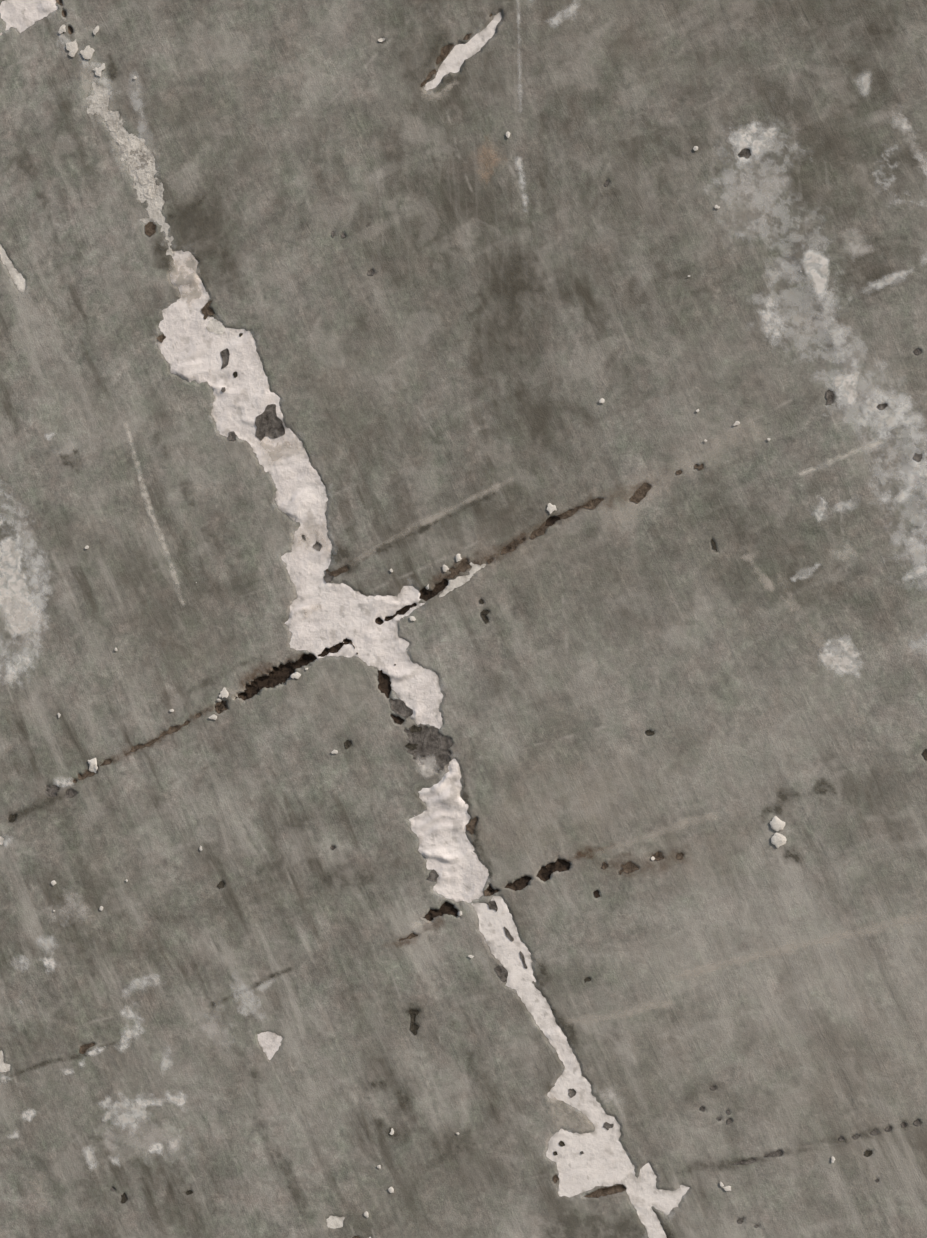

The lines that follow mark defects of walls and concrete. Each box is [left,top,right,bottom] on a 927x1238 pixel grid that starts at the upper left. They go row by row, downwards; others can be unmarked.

peeling [0,0,690,1238]
crack [375,464,704,625]
crack [9,638,358,822]